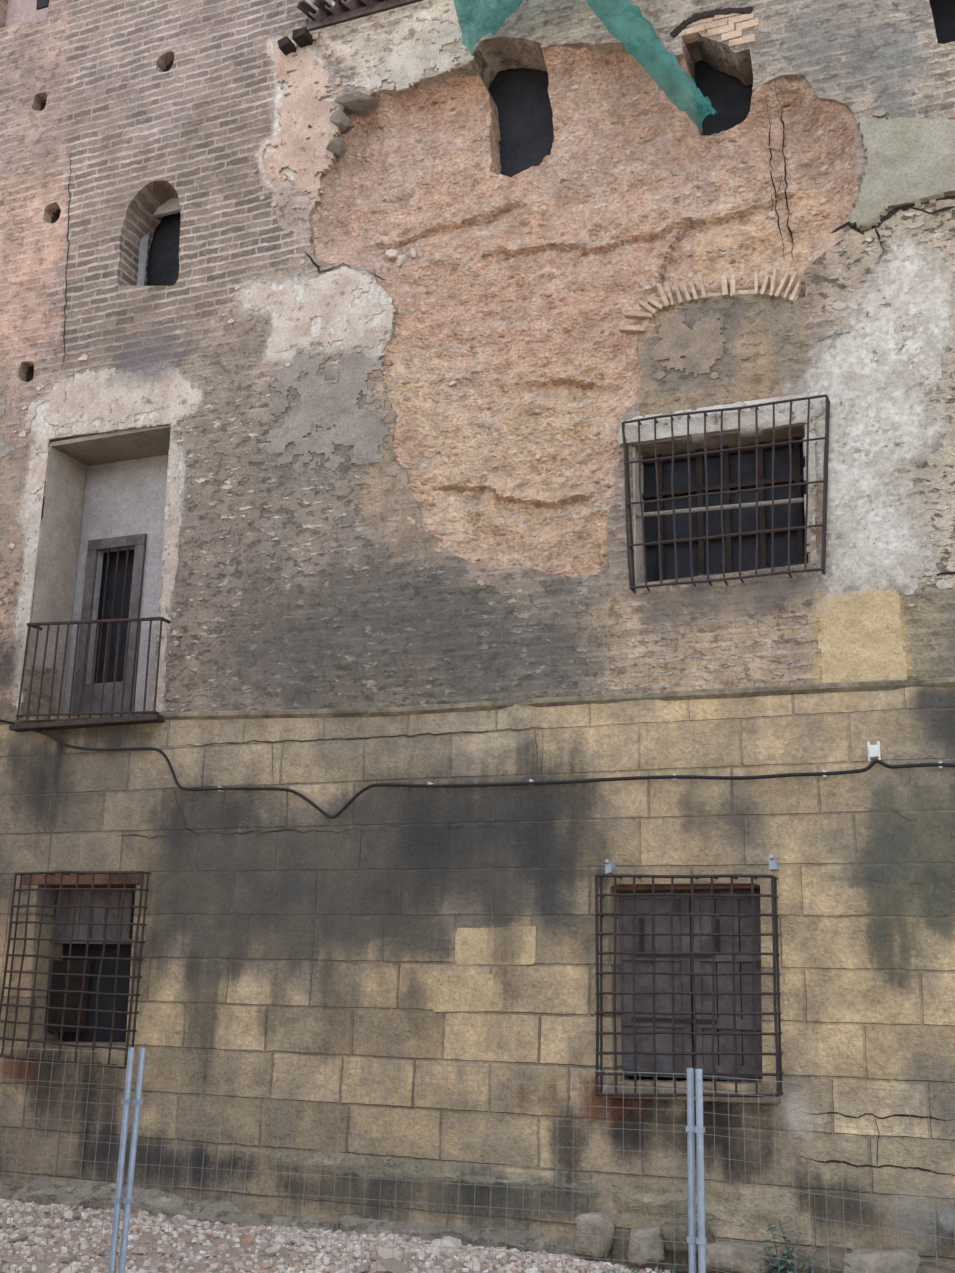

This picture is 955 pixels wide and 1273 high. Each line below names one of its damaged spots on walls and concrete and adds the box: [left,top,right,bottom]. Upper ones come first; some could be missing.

crack [764,81,794,260]
crack [831,195,955,264]
spalling [235,3,955,683]
leakage [79,1067,251,1179]
leakage [427,1111,586,1219]
leakage [612,1099,752,1172]
crack [800,1111,955,1176]